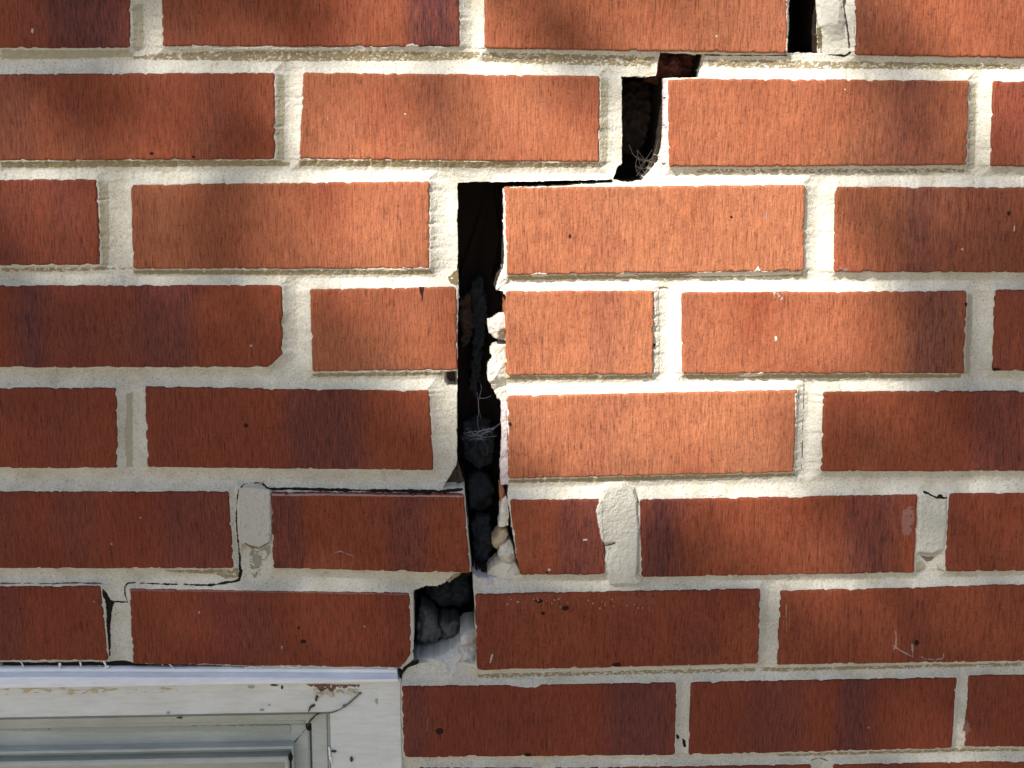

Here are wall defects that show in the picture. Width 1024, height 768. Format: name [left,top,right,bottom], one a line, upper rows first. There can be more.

crack [0,0,852,678]